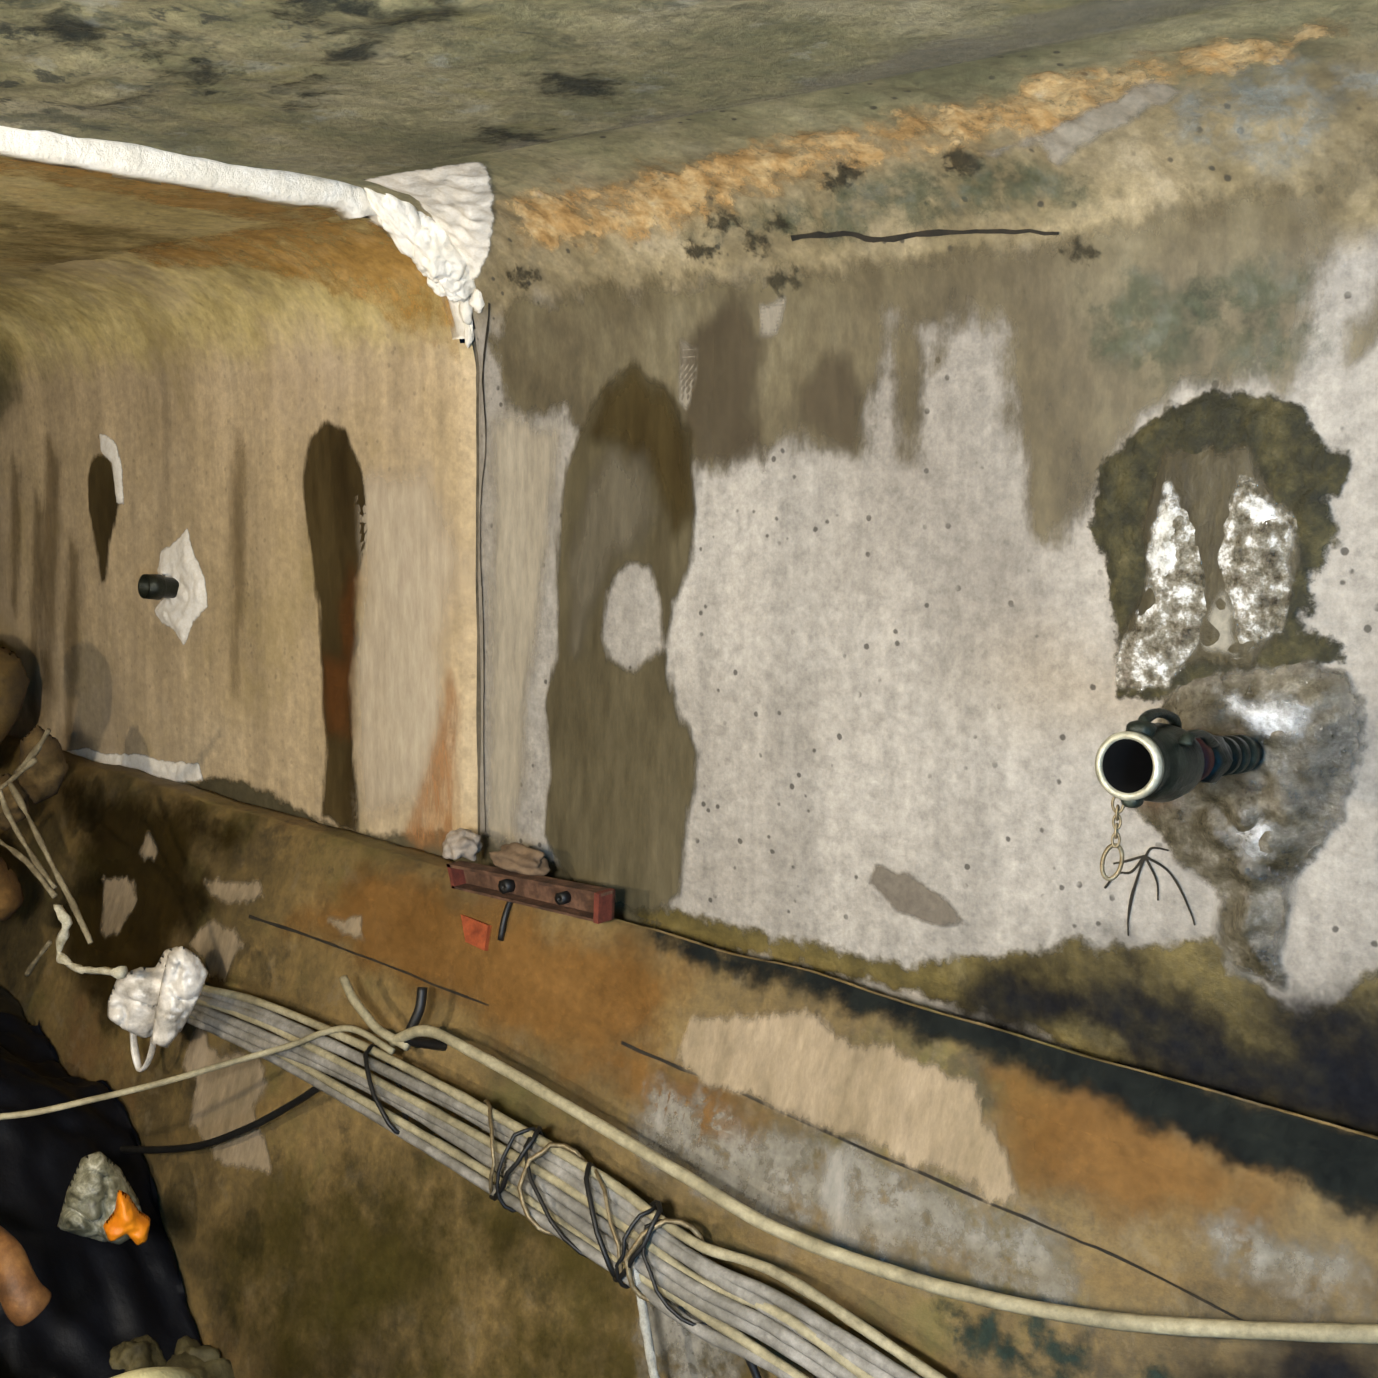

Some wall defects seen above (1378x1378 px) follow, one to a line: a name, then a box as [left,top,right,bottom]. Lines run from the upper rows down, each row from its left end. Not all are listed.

water stain [991,83,1195,165]
crack [790,229,1059,243]
water stain [56,157,1378,1209]